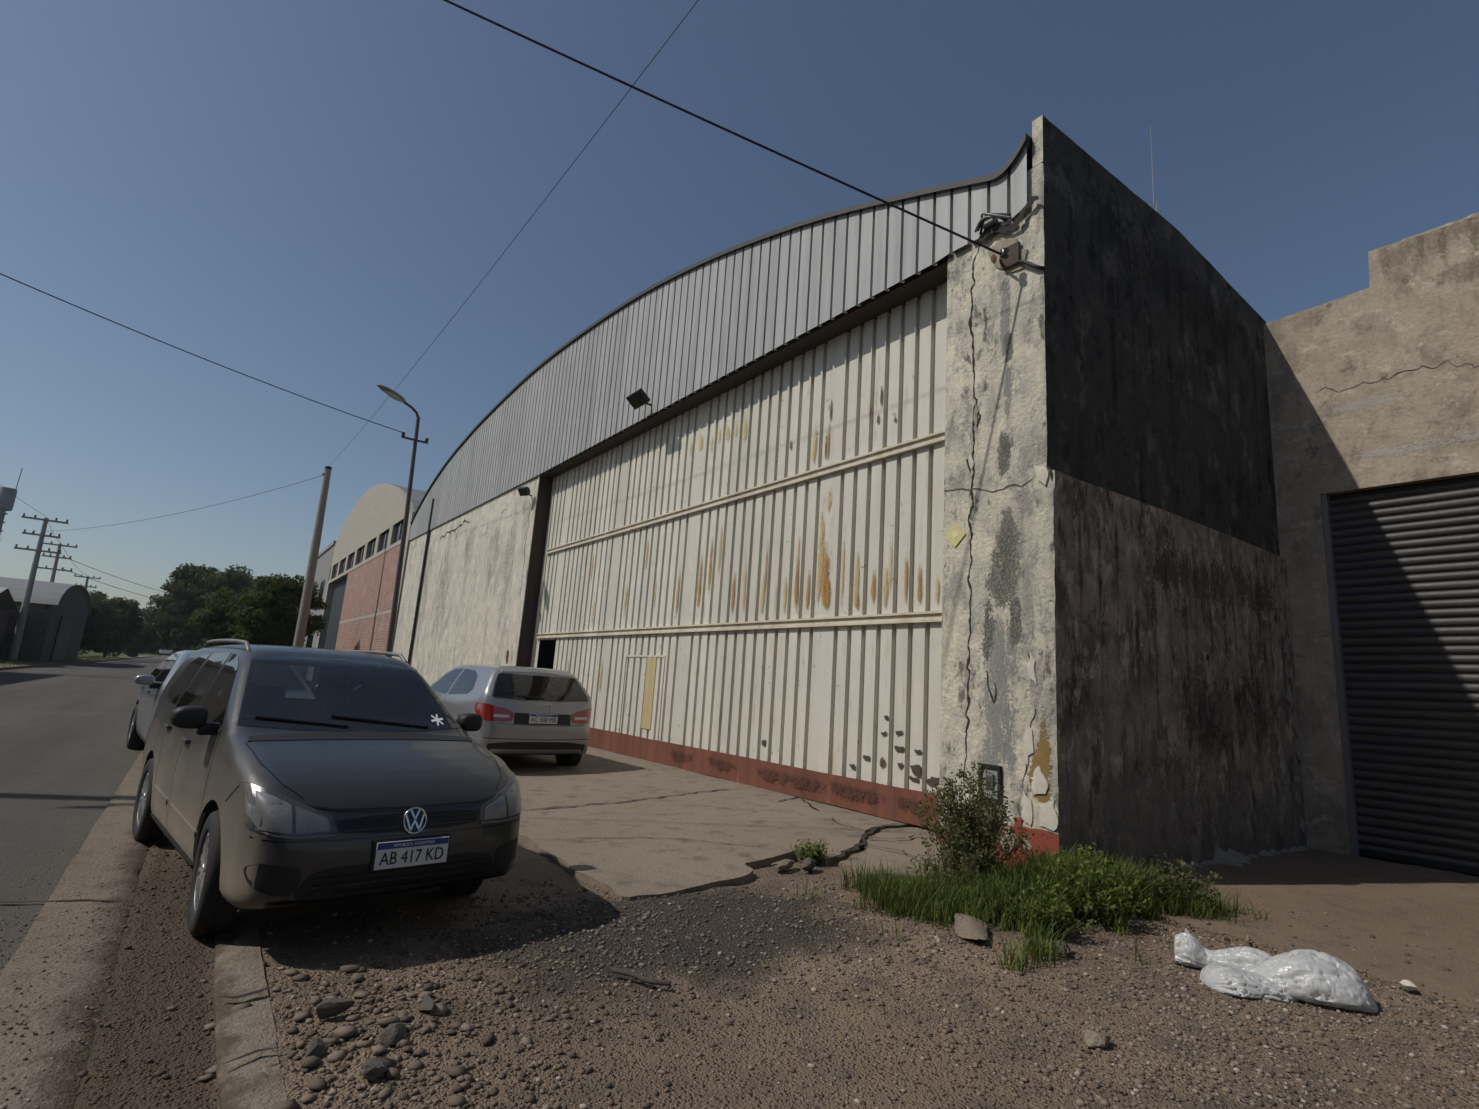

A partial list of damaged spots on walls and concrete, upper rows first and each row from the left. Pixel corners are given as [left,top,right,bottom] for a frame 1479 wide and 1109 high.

corrosion [812,401,832,462]
crack [1317,360,1479,392]
corrosion [697,486,939,613]
crack [945,196,1039,804]
peeling [994,708,1059,851]